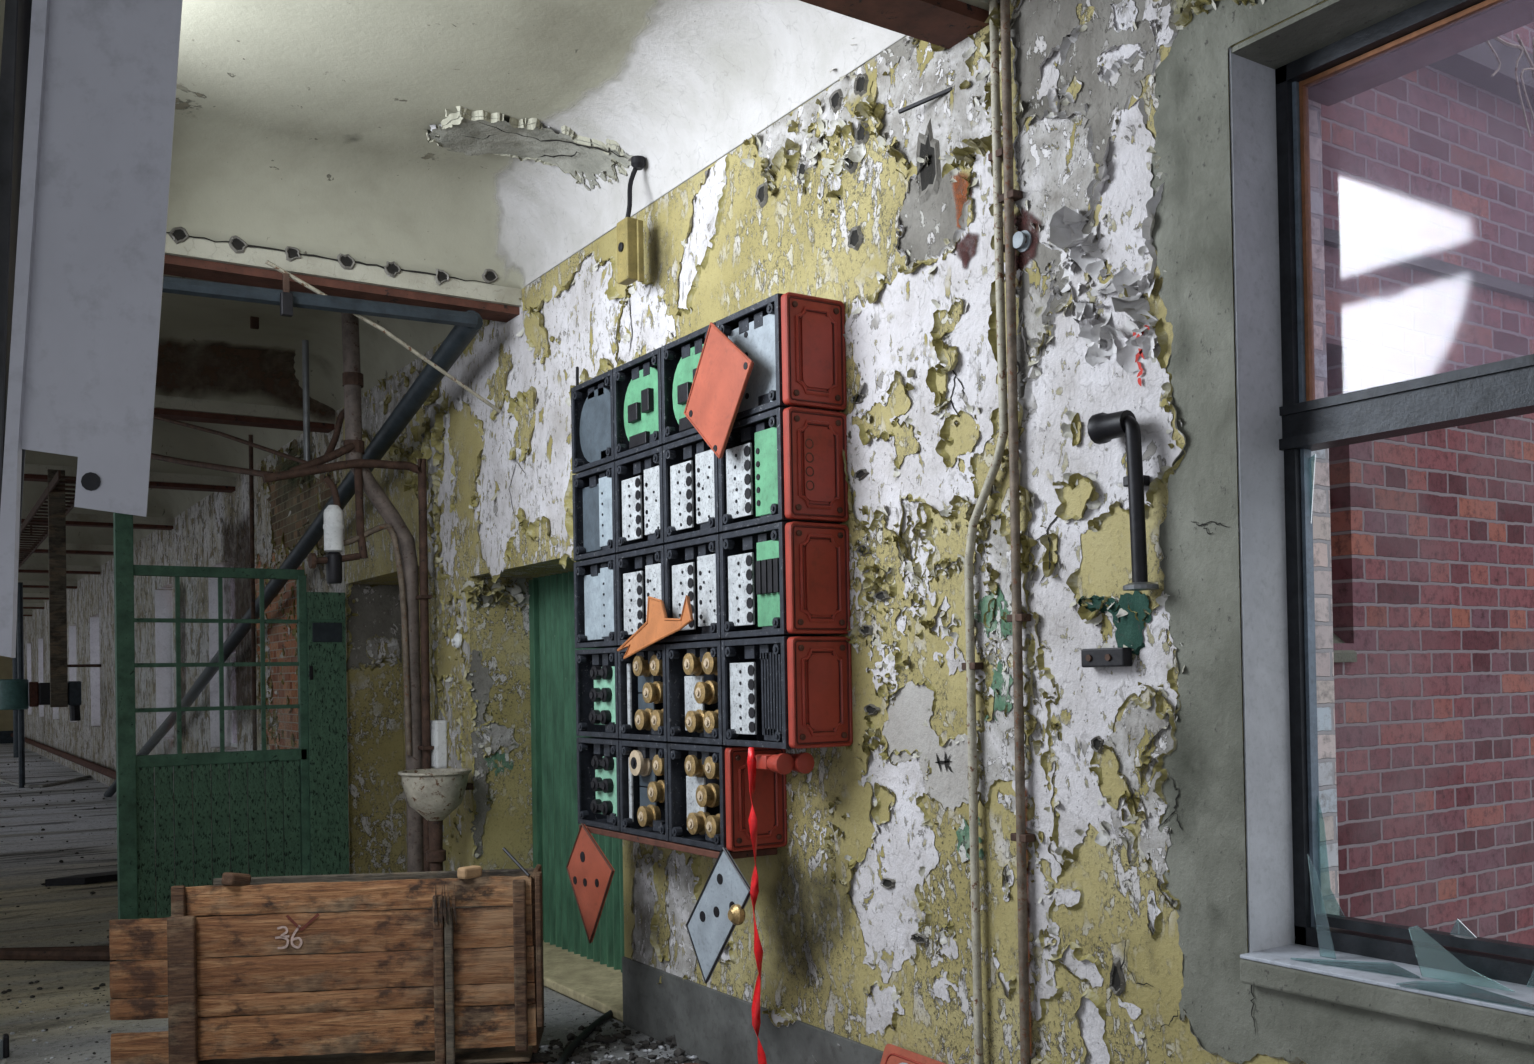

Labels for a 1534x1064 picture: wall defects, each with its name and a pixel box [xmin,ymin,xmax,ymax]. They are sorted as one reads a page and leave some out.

flaking render [384,261,401,278]
leakage [156,340,336,419]
peeling [361,348,433,442]
peeling [389,0,1264,1064]